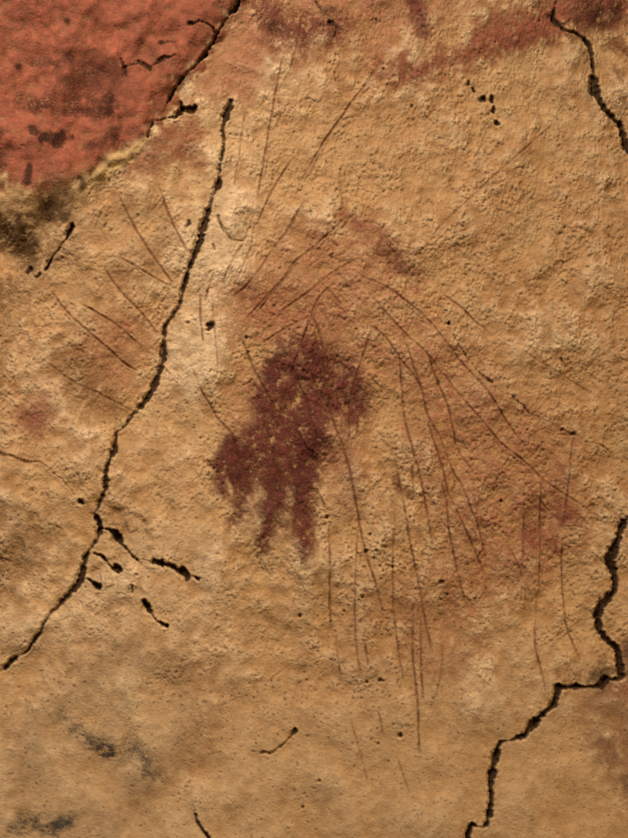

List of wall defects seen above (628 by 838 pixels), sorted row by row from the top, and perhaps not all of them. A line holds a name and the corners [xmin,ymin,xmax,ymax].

crack [121,41,170,75]
crack [147,0,240,138]
crack [550,9,628,154]
crack [3,99,233,670]
crack [465,517,628,838]